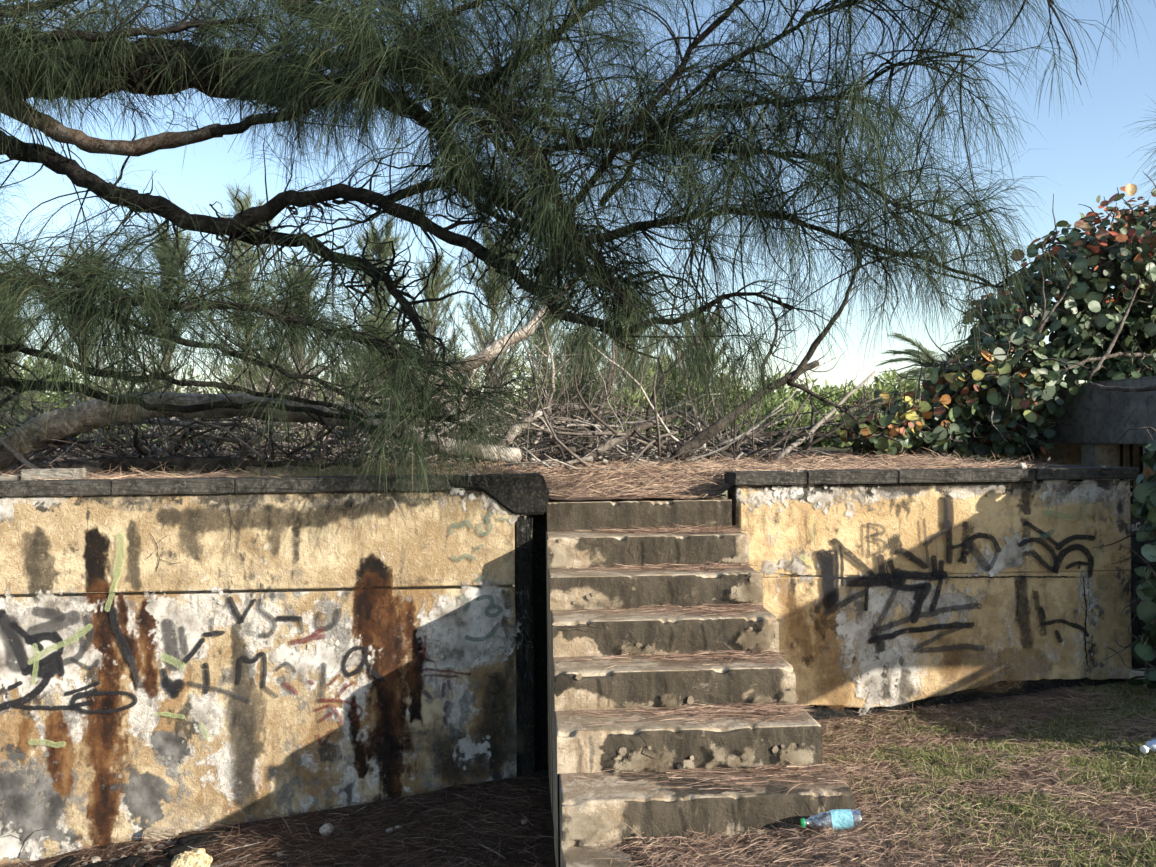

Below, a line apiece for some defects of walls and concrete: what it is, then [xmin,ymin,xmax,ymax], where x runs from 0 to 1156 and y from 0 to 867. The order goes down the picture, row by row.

damp [23,527,58,602]
corrosion [16,528,160,848]
damp [229,623,266,810]
damp [157,497,395,560]
corrosion [347,554,424,801]
peeling [836,527,1031,715]
damp [1016,575,1047,649]